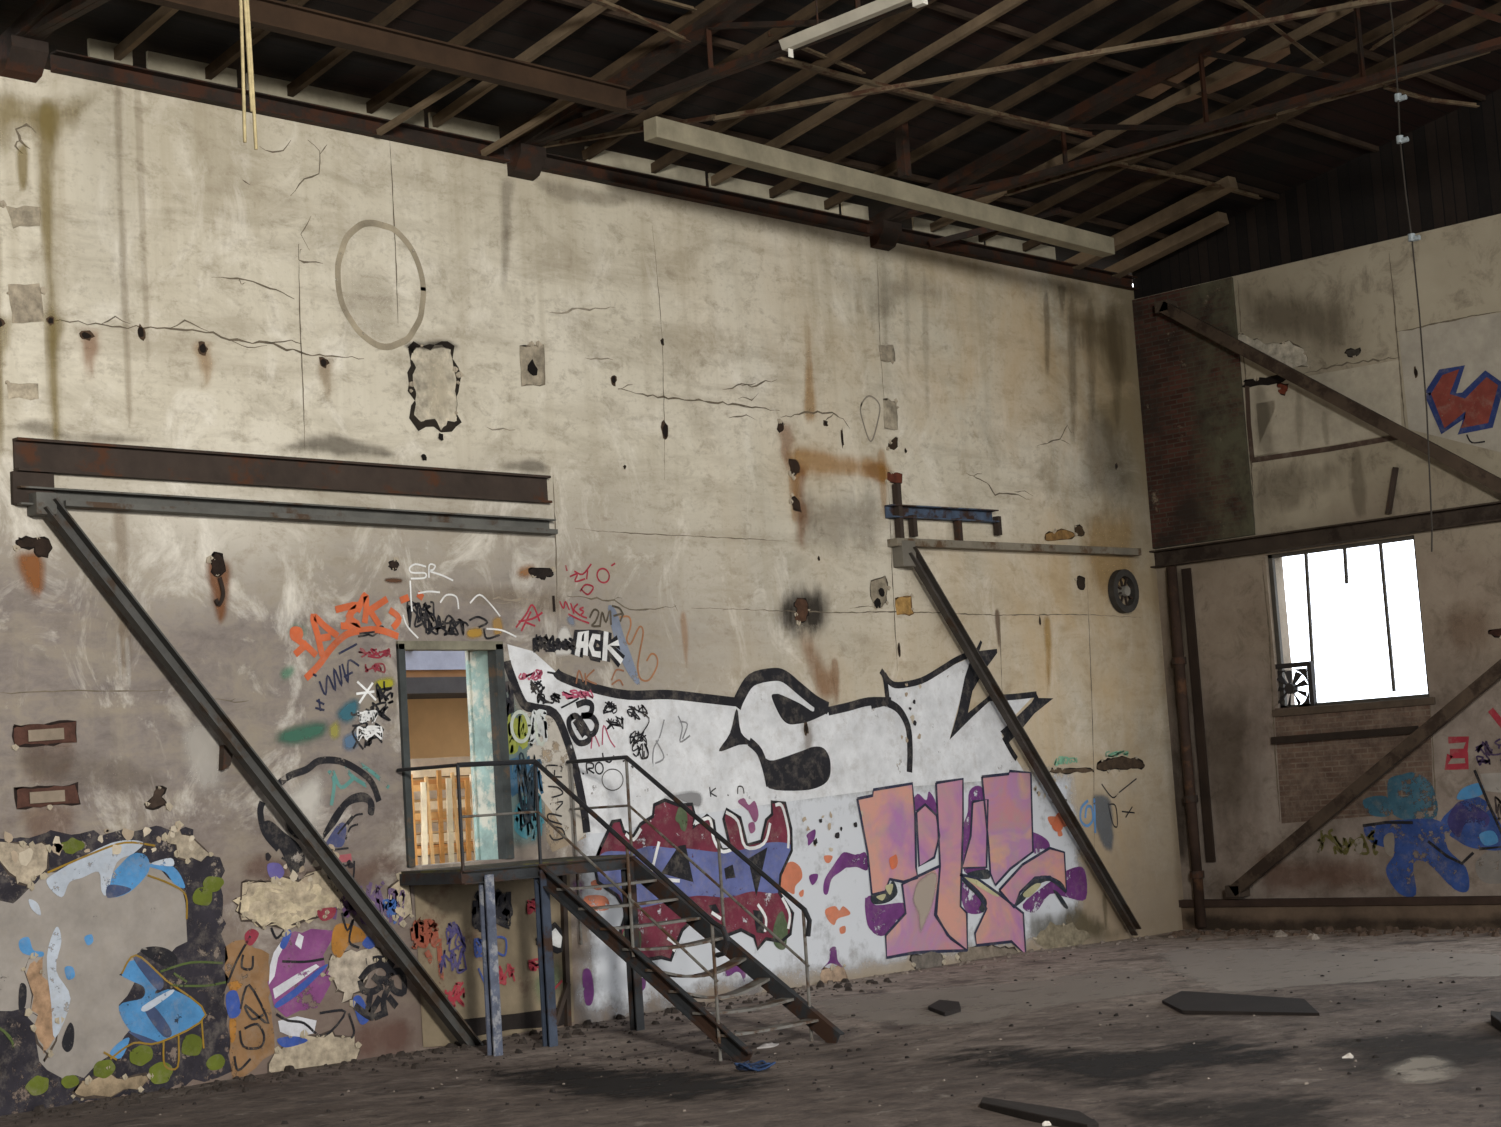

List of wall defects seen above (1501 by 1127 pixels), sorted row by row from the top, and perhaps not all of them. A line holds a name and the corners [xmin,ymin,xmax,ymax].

water stain [0,100,76,258]
crack [221,140,327,299]
crack [55,316,364,359]
spalling [407,341,464,441]
corrosion [20,554,42,593]
corrosion [209,563,229,620]
peeling [84,786,214,864]
peeling [0,831,63,891]
peeling [232,853,346,937]
peeling [320,946,388,1008]
peeling [267,1029,362,1073]
peeling [71,1066,154,1101]